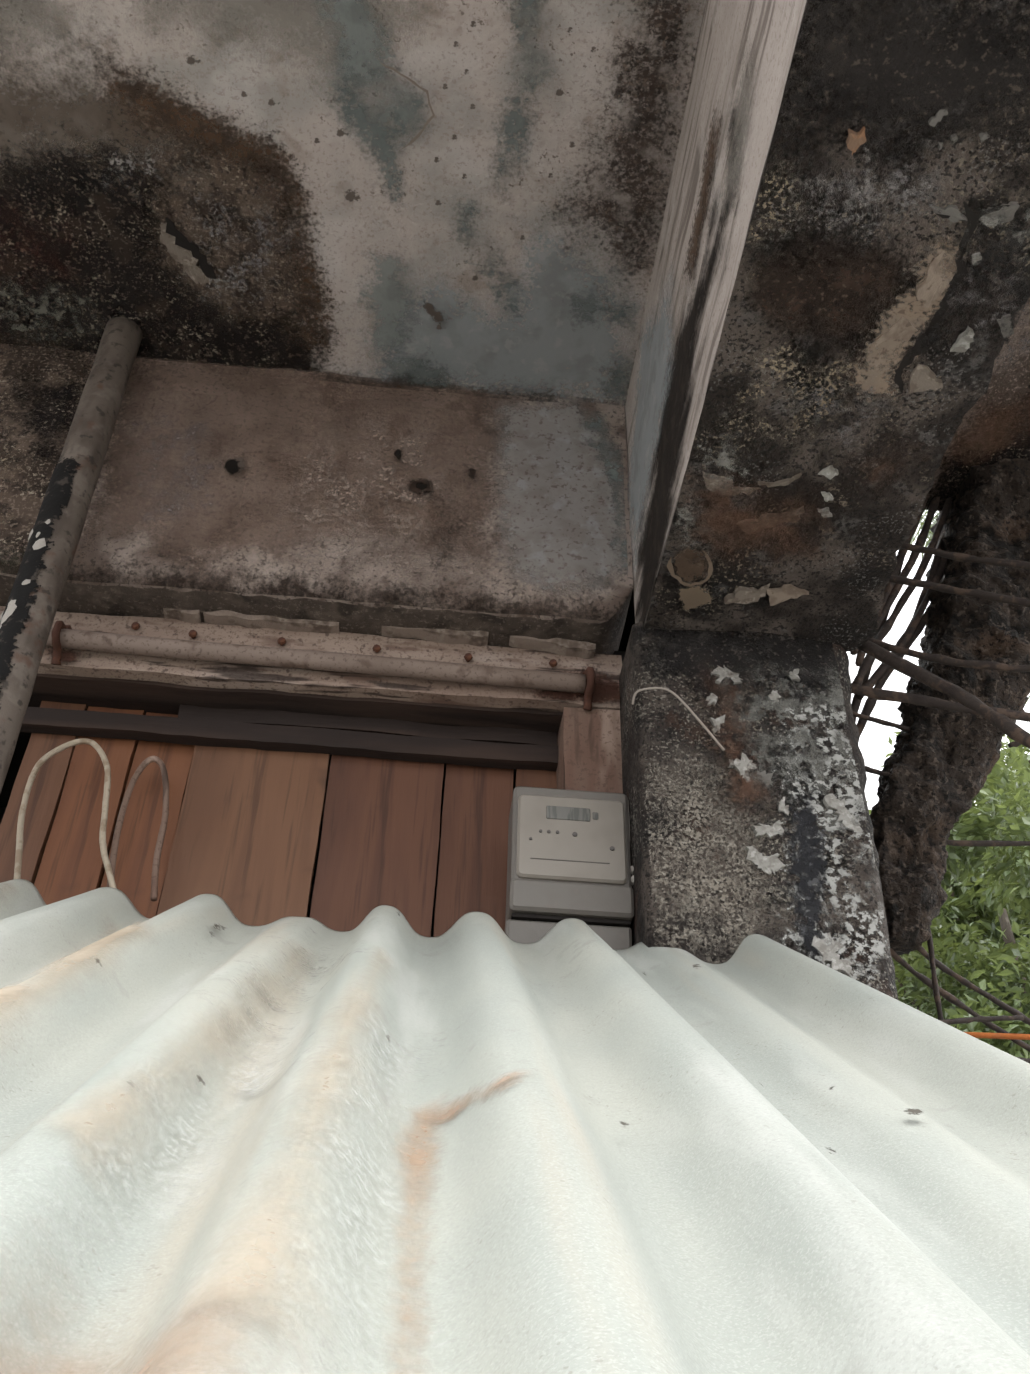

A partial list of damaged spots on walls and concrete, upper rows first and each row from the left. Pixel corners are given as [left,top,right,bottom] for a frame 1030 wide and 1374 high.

spalling [160,217,216,285]
leakage [0,0,751,627]
leakage [741,235,904,348]
peeling [842,201,1030,410]
peeling [702,465,839,526]
peeling [724,583,809,606]
peeling [705,665,743,733]
peeling [789,669,800,682]
peeling [728,753,789,875]
spalling [823,458,1030,1063]